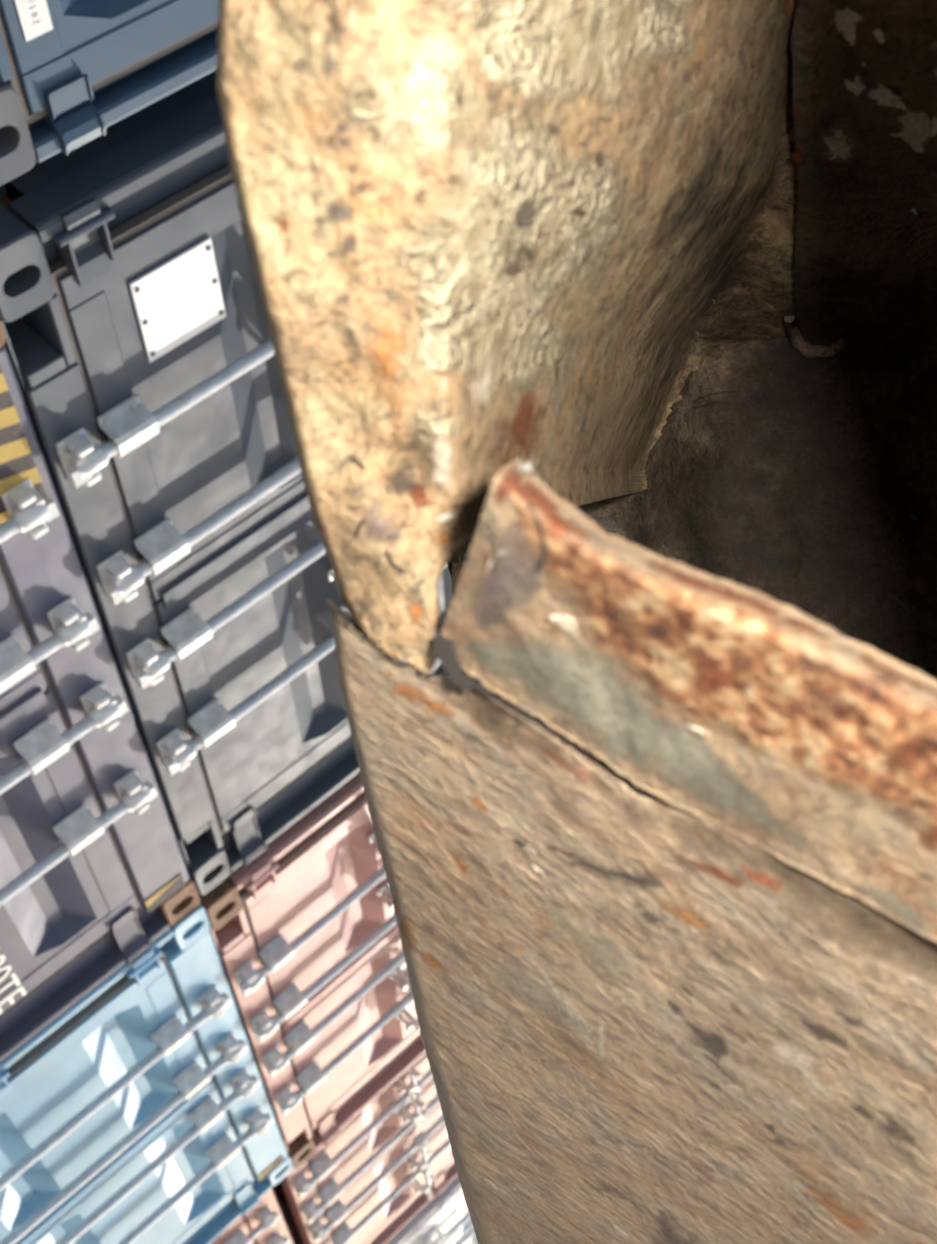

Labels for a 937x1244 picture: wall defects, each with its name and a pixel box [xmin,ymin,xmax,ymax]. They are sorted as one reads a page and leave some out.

crack [324,597,639,806]
rust [498,397,937,845]
rust [693,862,780,890]